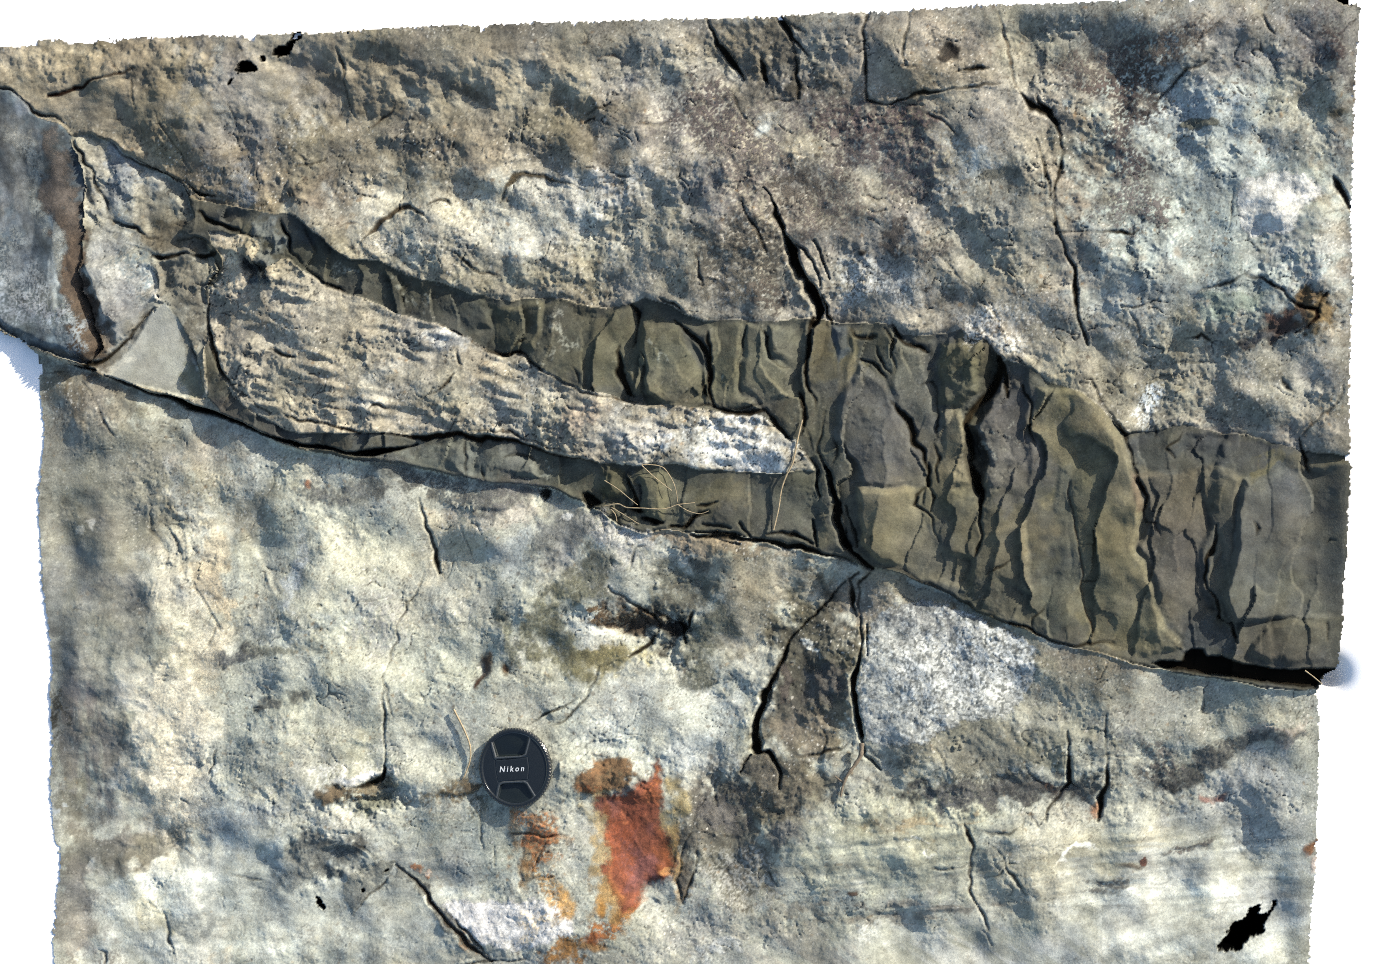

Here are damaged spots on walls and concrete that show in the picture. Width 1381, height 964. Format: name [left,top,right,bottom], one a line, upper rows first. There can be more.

crack [862,16,1010,105]
crack [1022,94,1088,345]
crack [440,204,1033,613]
crack [752,635,793,785]
crack [812,651,864,755]
crack [381,875,485,964]
rust [514,811,574,917]
rust [539,762,689,964]